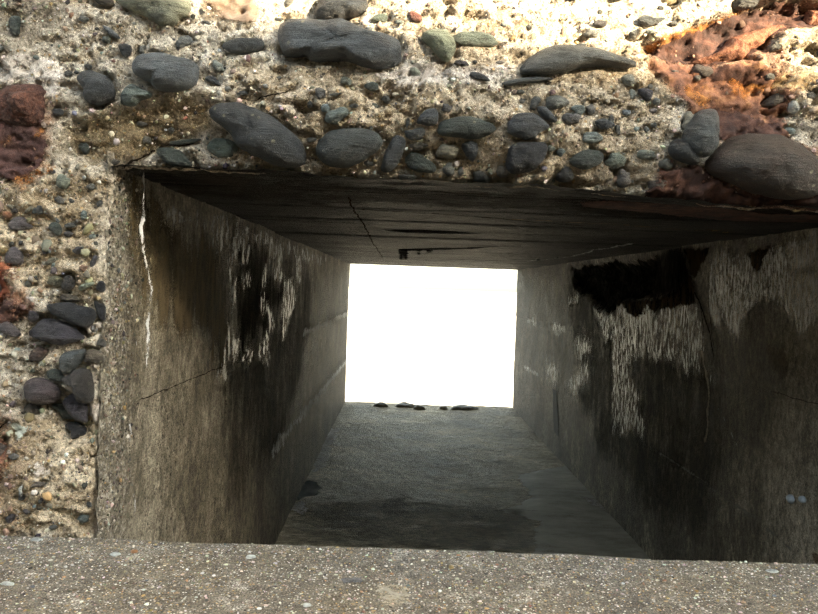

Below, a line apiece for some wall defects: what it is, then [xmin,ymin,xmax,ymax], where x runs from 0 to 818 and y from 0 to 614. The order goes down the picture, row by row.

corrosion [644,9,818,140]
corrosion [0,119,53,191]
corrosion [644,164,818,212]
crack [348,197,582,257]
corrosion [0,253,35,323]
damp [114,173,326,382]
spalling [573,247,688,313]
damp [568,337,591,395]
damp [593,228,818,443]